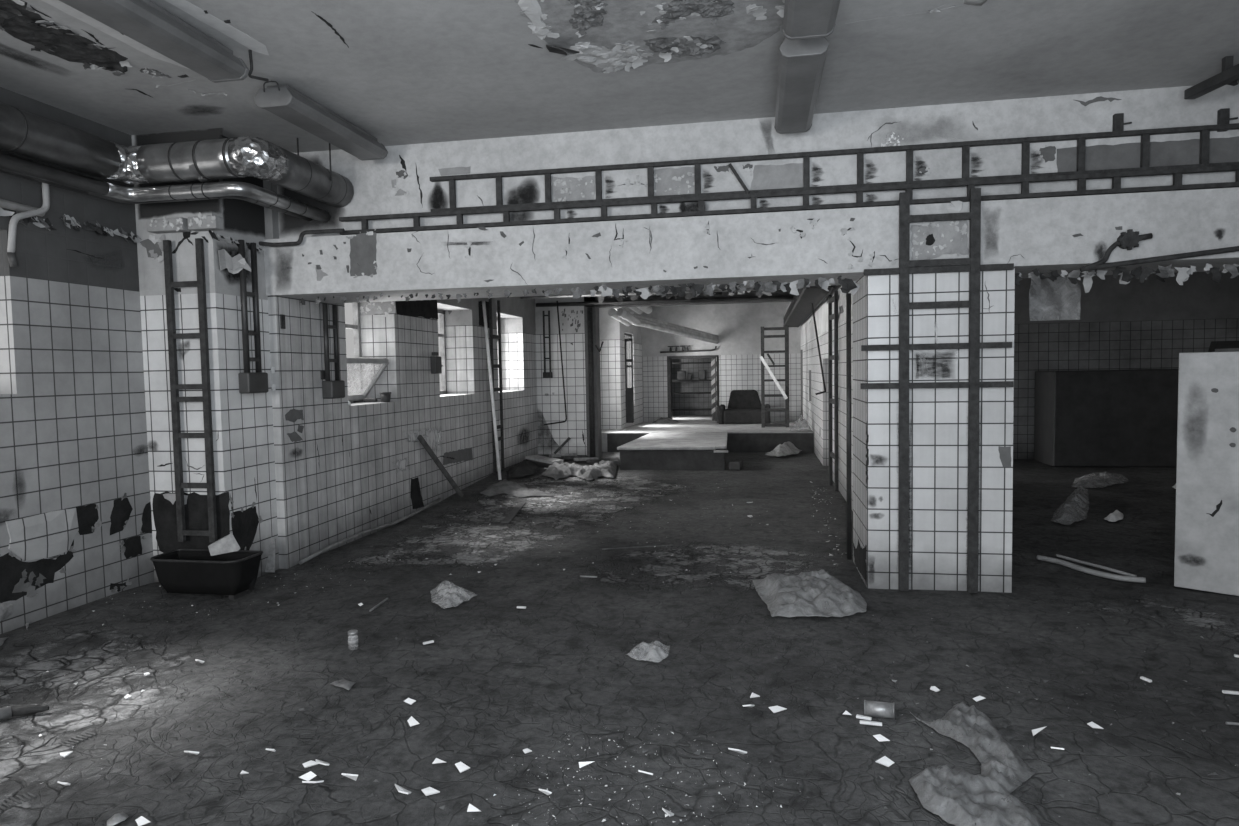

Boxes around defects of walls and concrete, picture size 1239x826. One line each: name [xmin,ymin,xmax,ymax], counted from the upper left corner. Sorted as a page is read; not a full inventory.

crack [311,11,349,48]
peeling [514,0,785,73]
leakage [434,184,442,208]
leakage [509,181,536,204]
spalling [302,229,377,281]
crack [510,230,570,284]
crack [609,225,652,265]
crack [703,218,897,270]
peeling [1015,263,1239,293]
peeling [300,266,860,345]
peeling [0,491,263,603]
spalling [853,539,867,585]